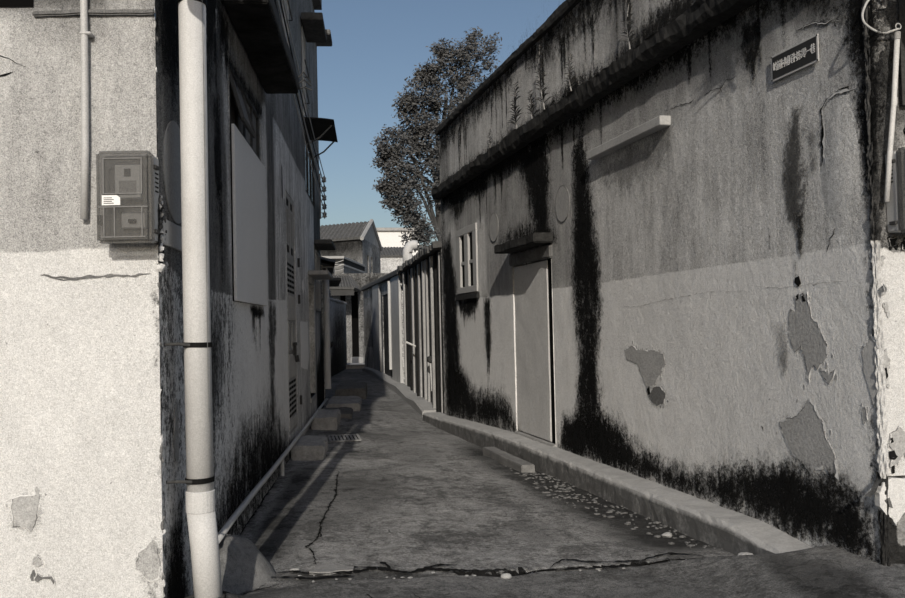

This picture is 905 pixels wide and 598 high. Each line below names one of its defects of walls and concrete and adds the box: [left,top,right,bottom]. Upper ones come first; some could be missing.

damp [154,0,179,99]
damp [206,0,262,272]
crack [43,273,152,281]
damp [439,0,888,563]
damp [211,305,224,441]
damp [217,299,291,536]
peeling [624,341,668,408]
peeling [777,276,843,480]
peeling [861,334,891,424]
peeling [30,554,55,587]
crack [222,473,705,598]
spalling [865,425,905,564]